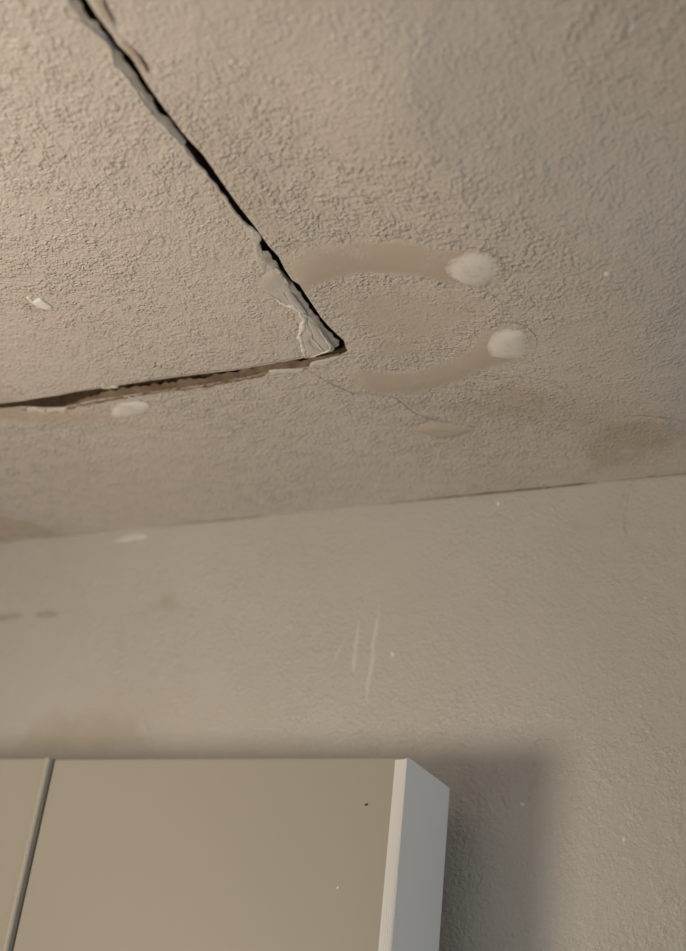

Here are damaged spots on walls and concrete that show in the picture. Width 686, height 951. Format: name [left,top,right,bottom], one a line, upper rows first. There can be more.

crack [0,0,445,422]
damp [307,277,503,370]